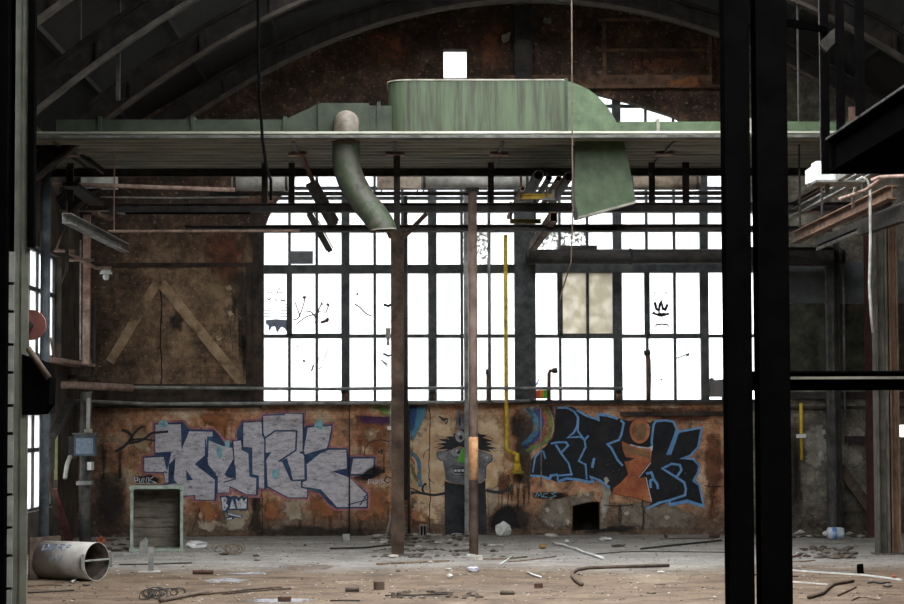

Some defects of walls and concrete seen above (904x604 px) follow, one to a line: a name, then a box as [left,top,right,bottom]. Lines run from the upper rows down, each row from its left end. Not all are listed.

leakage [96,449,126,525]
peeling [198,510,249,532]
peeling [540,477,692,530]